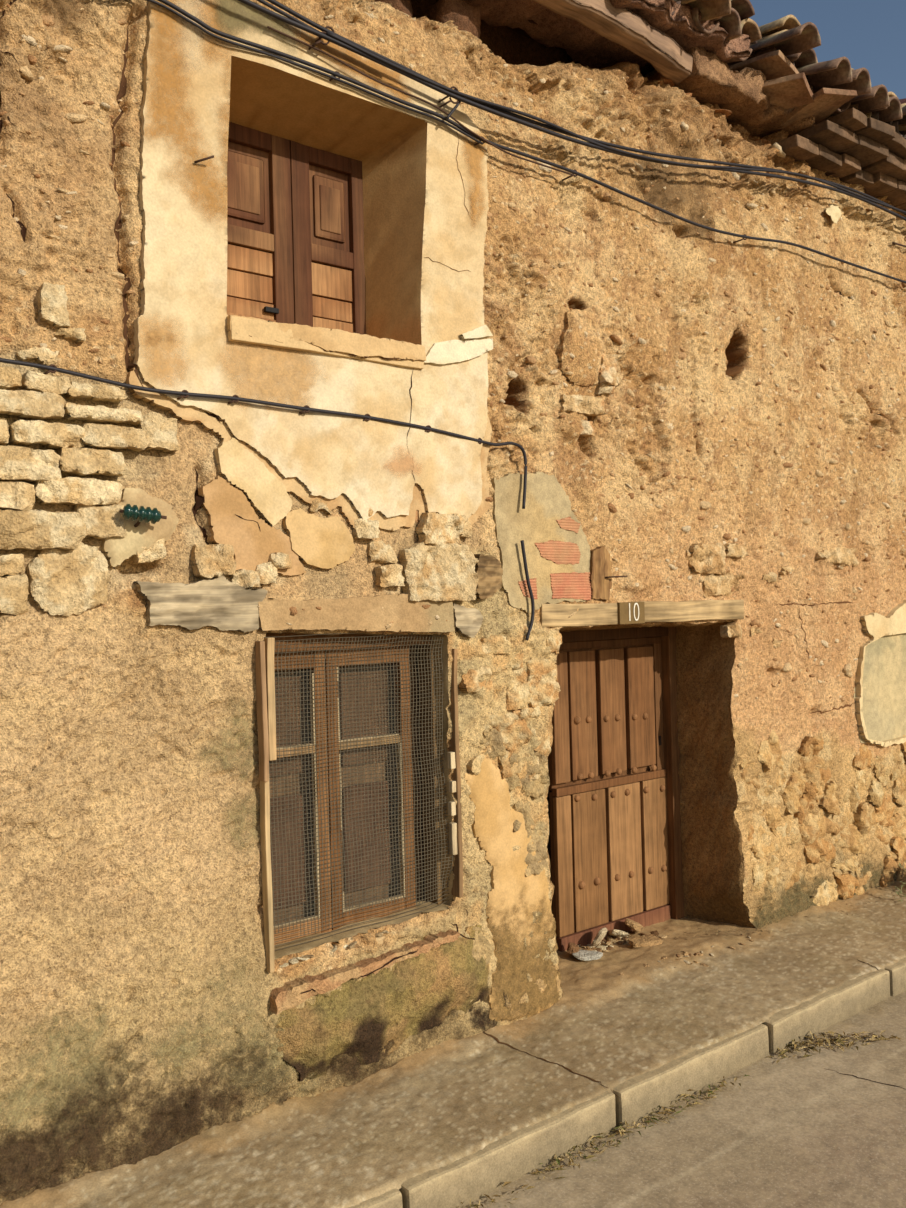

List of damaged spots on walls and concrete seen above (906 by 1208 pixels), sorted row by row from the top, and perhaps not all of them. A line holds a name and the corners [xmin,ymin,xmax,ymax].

crack [0,48,22,157]
crack [6,193,27,242]
crack [111,19,143,386]
spalling [0,282,180,616]
peeling [191,438,479,602]
spalling [459,621,562,1021]
damp [0,1048,265,1201]
damp [325,1039,397,1084]